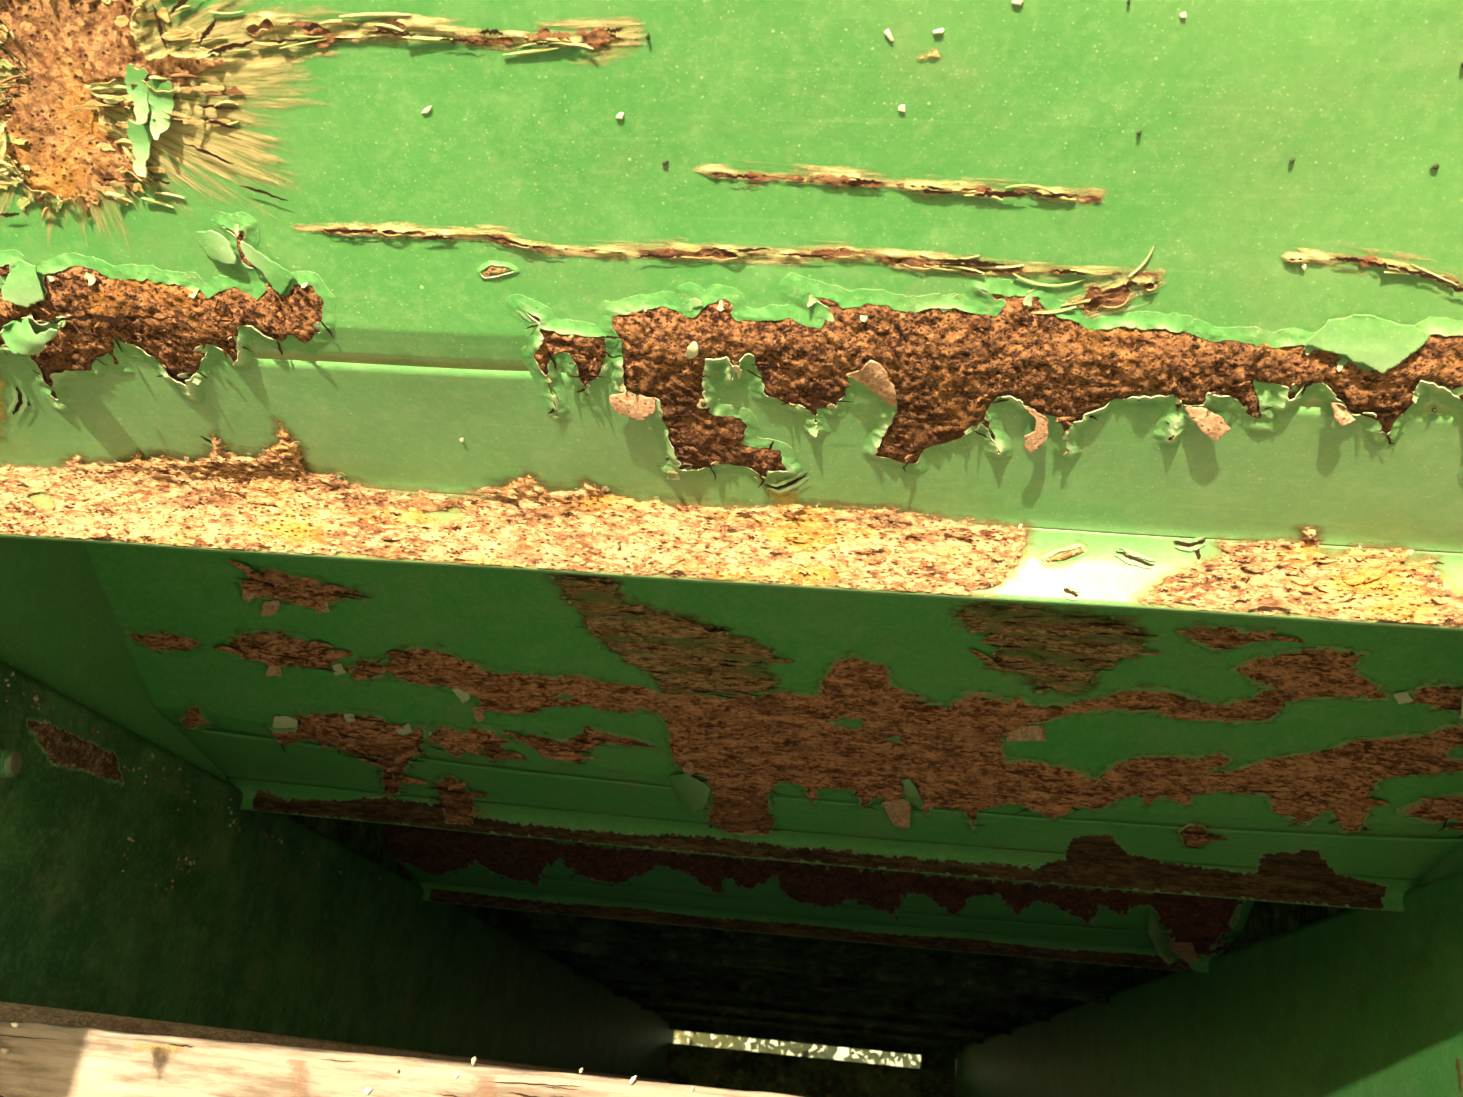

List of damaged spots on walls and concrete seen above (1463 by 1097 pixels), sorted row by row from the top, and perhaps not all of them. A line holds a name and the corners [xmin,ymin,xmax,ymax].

peeling [113,0,220,58]
crack [127,0,646,58]
peeling [0,63,244,212]
crack [142,176,171,184]
crack [184,104,1163,318]
crack [516,301,542,322]
crack [1283,248,1463,292]
peeling [548,574,796,699]
corrosion [0,261,1463,972]
peeling [954,601,1163,693]